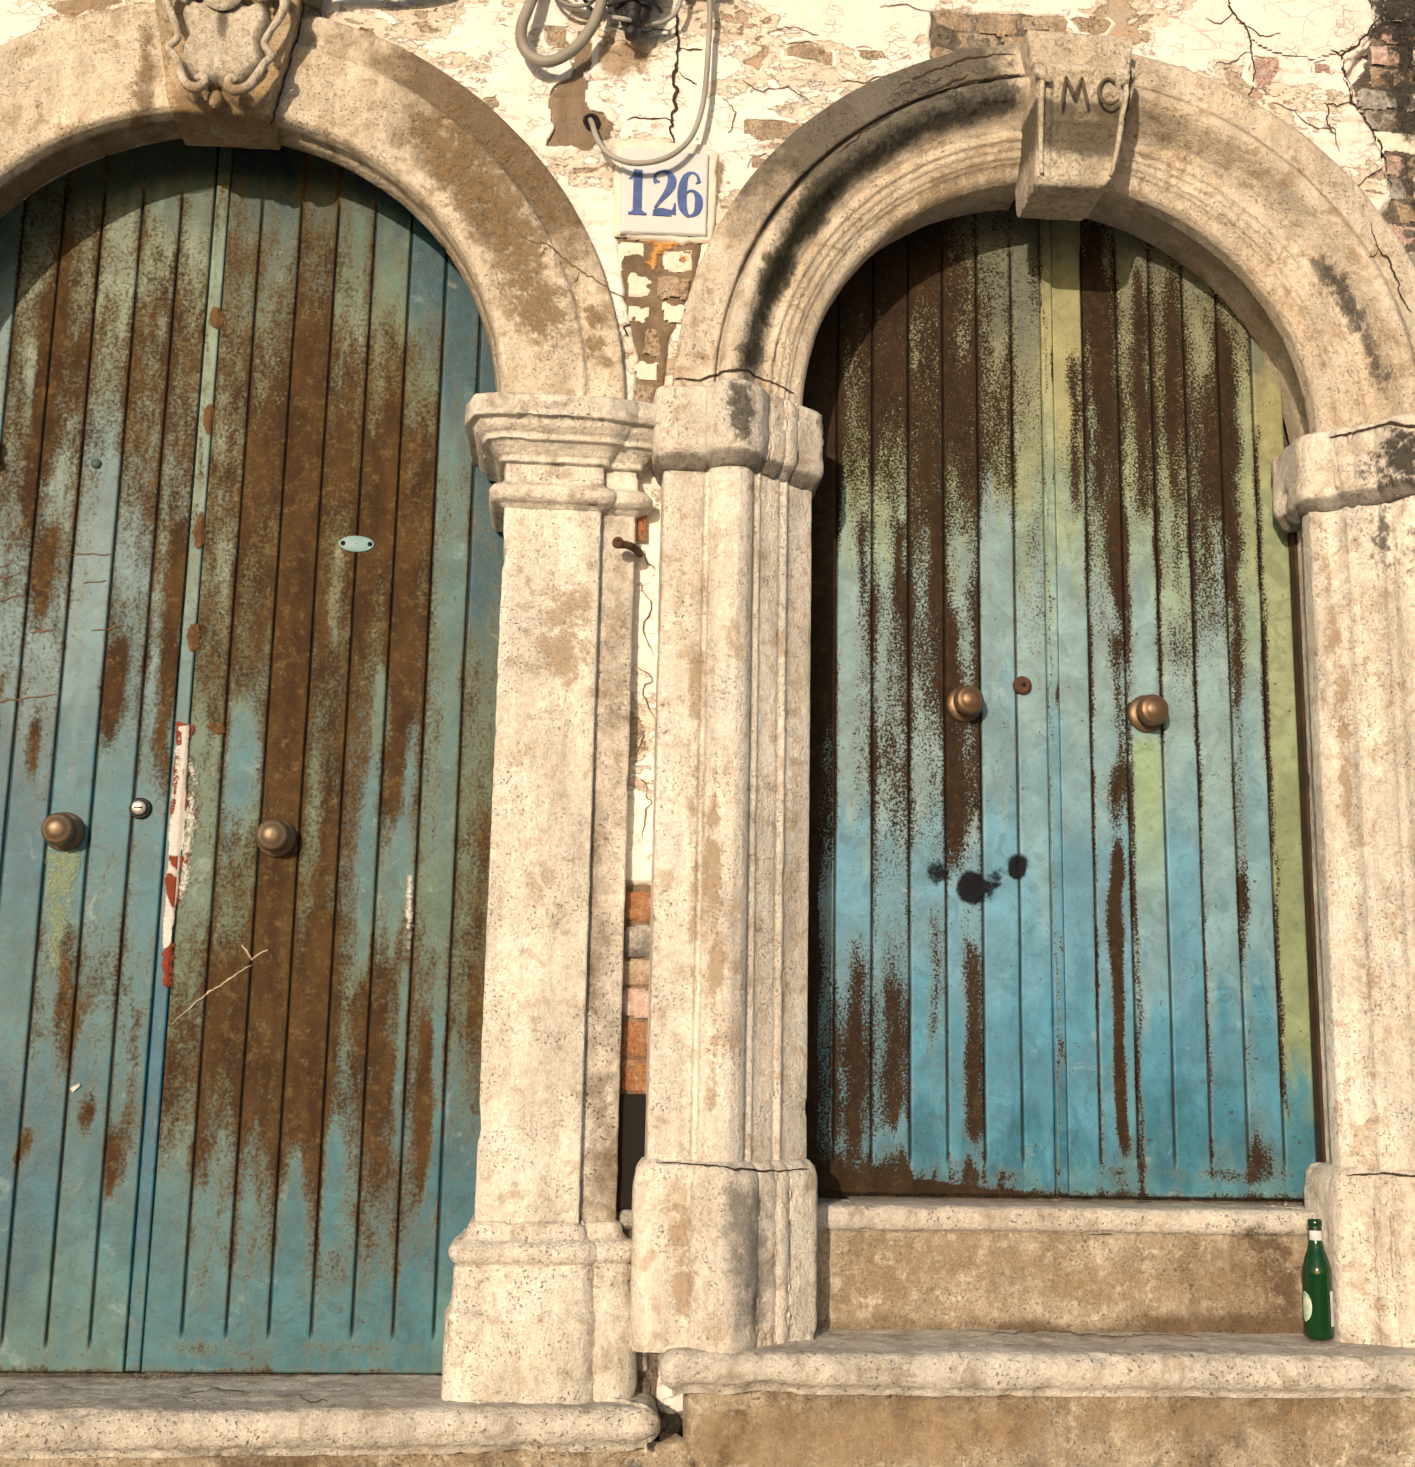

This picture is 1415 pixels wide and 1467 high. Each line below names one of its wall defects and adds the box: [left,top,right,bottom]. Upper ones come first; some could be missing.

spalling [929,10,1116,58]
crack [1207,0,1392,187]
spalling [1305,0,1415,265]
spalling [617,237,701,403]
damp [726,55,1021,444]
damp [1309,253,1390,389]
rust [192,512,206,548]
rust [186,624,201,651]
rust [47,852,77,1016]